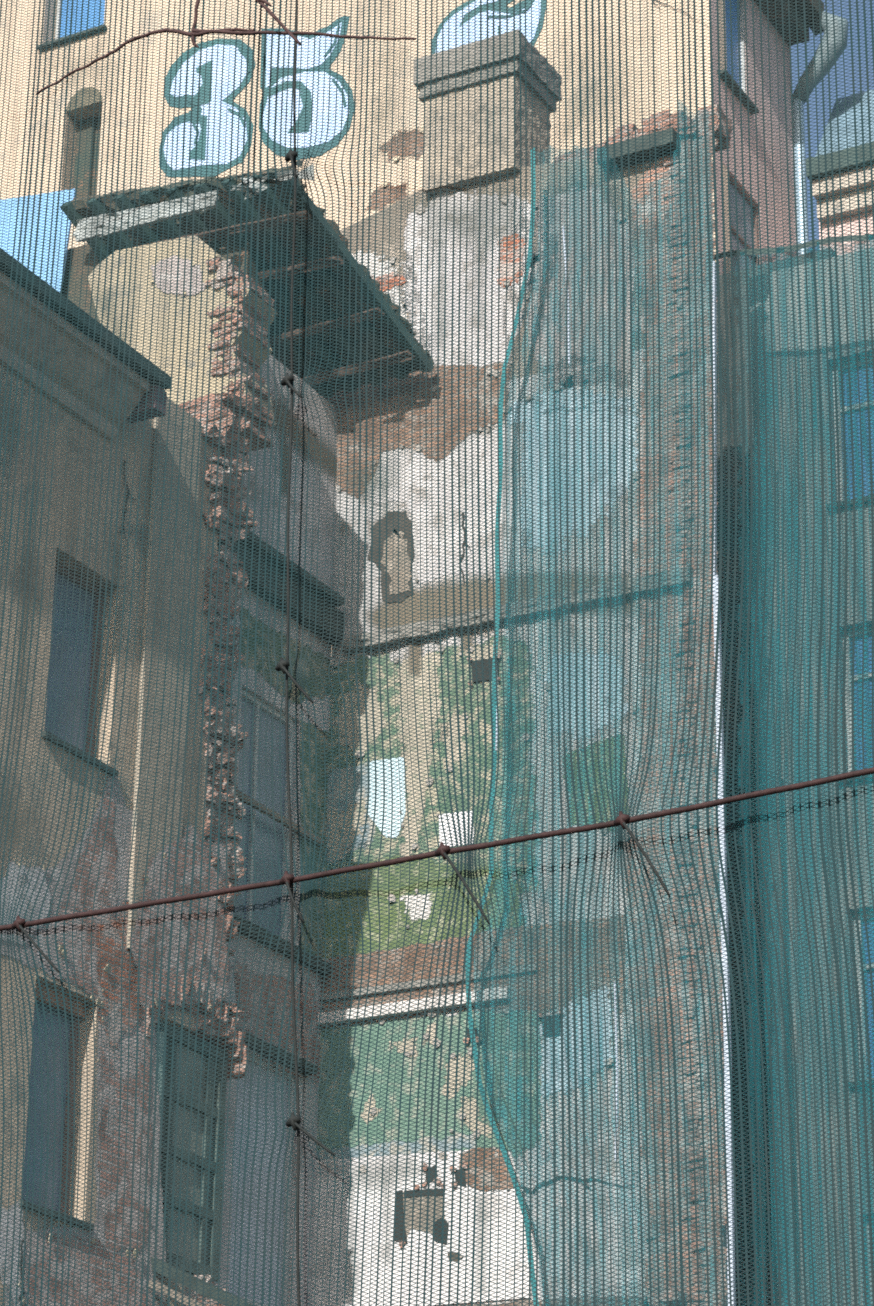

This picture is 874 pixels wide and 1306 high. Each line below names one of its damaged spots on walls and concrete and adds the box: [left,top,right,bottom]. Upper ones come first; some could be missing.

flaking render [352,182,641,584]
peeling [1,393,656,1306]